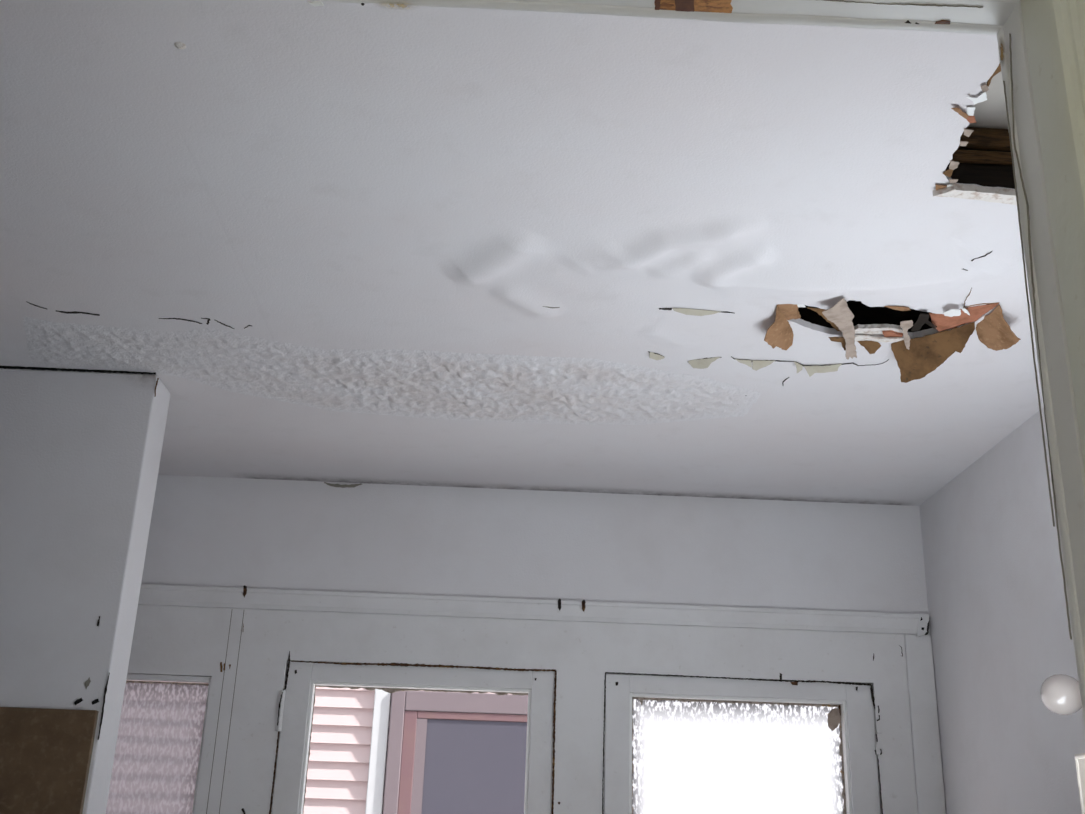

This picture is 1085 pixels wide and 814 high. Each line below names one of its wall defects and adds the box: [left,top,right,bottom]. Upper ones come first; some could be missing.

peeling [655,0,733,13]
crack [26,301,100,316]
crack [159,318,252,329]
spalling [827,324,904,342]
peeling [688,356,889,377]